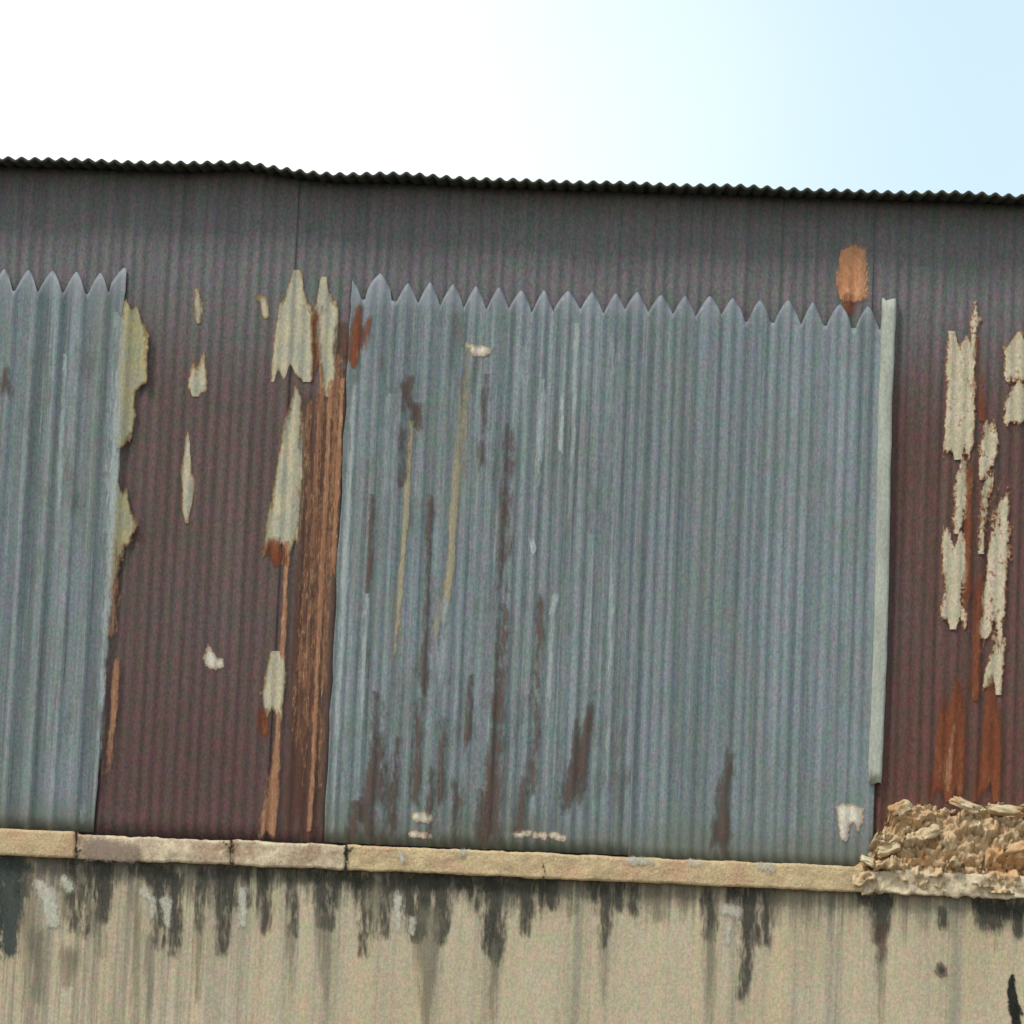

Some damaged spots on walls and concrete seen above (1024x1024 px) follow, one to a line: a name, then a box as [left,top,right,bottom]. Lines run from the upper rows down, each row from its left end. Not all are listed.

corrosion [836,244,868,315]
peeling [256,270,339,558]
corrosion [257,305,371,837]
corrosion [393,377,422,654]
peeling [940,300,1024,695]
peeling [259,651,287,722]
corrosion [929,468,1003,802]
spalling [852,796,1024,893]
damp [0,855,114,957]
damp [129,862,272,954]
damp [284,868,560,965]
damp [700,886,775,998]